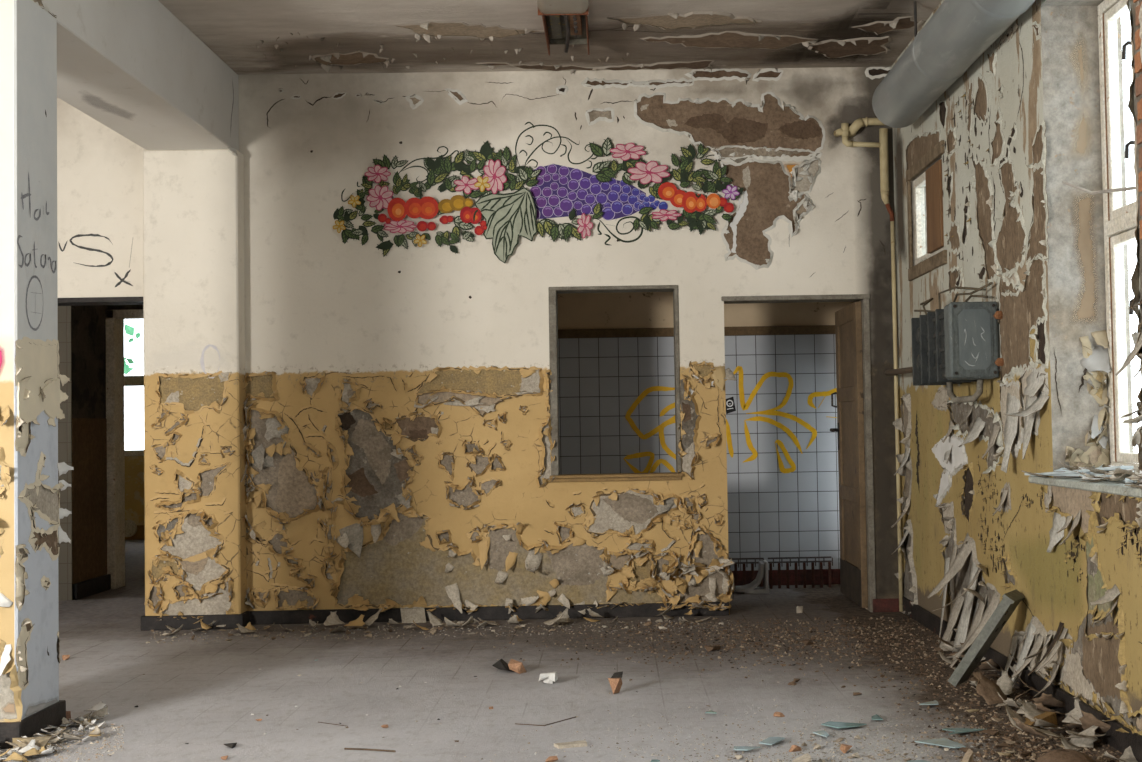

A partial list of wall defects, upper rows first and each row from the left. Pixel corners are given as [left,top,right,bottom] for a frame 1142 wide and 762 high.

crack [266,80,330,128]
crack [367,78,656,130]
peeling [309,11,926,270]
peeling [0,337,74,722]
peeling [145,361,738,624]
peeling [891,0,1142,736]
flaking render [991,715,1064,757]